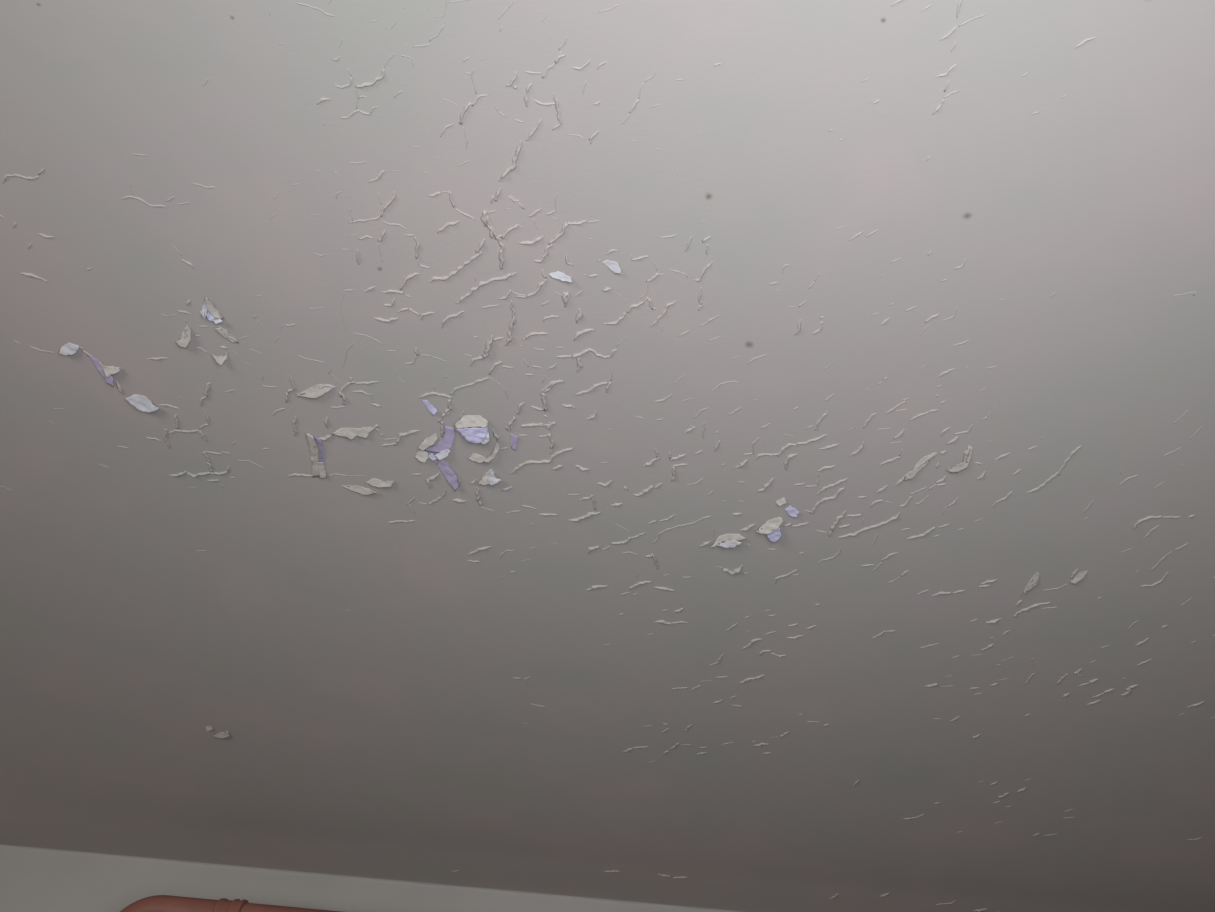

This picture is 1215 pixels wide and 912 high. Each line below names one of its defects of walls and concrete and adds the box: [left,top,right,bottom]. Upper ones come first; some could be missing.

peeling [548,271,572,283]
peeling [597,260,623,274]
peeling [161,297,248,366]
peeling [14,340,160,413]
peeling [287,433,327,479]
peeling [418,400,499,463]
peeling [711,497,811,548]